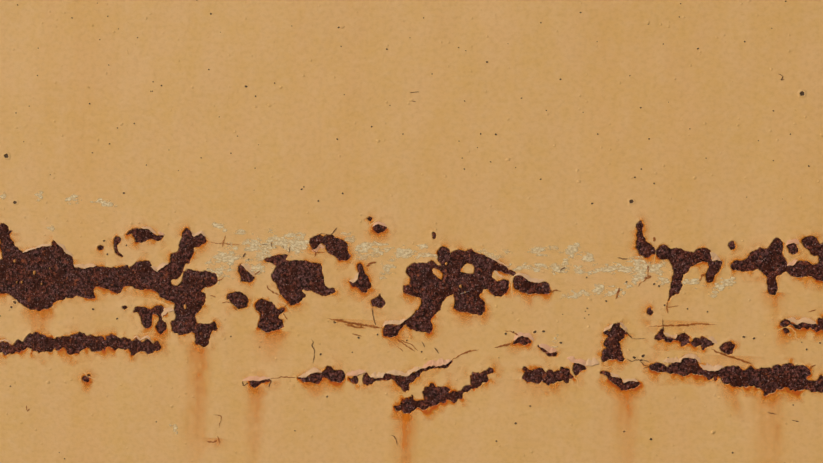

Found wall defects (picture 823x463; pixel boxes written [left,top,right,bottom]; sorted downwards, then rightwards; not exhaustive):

corrosion [0,223,219,359]
corrosion [227,234,385,337]
corrosion [381,246,552,341]
corrosion [510,322,643,408]
corrosion [633,220,823,302]
corrosion [645,329,823,401]
corrosion [777,314,823,338]